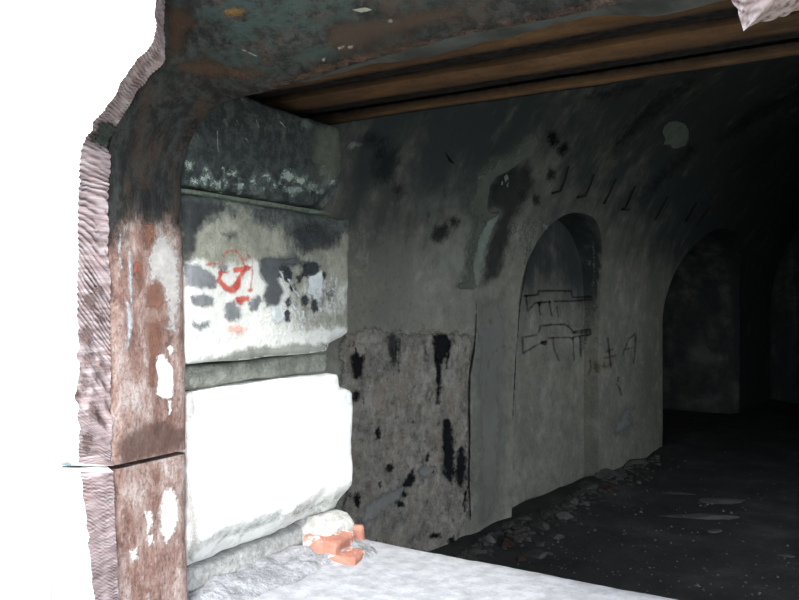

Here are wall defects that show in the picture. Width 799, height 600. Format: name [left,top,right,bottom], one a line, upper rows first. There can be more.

corrosion [135,224,164,310]
corrosion [149,319,160,386]
peeling [156,346,174,414]
damp [425,343,451,404]
corrosion [121,392,195,462]
spalling [303,327,473,566]
damp [455,446,467,513]
peeling [145,487,179,546]
corrosion [187,484,197,559]